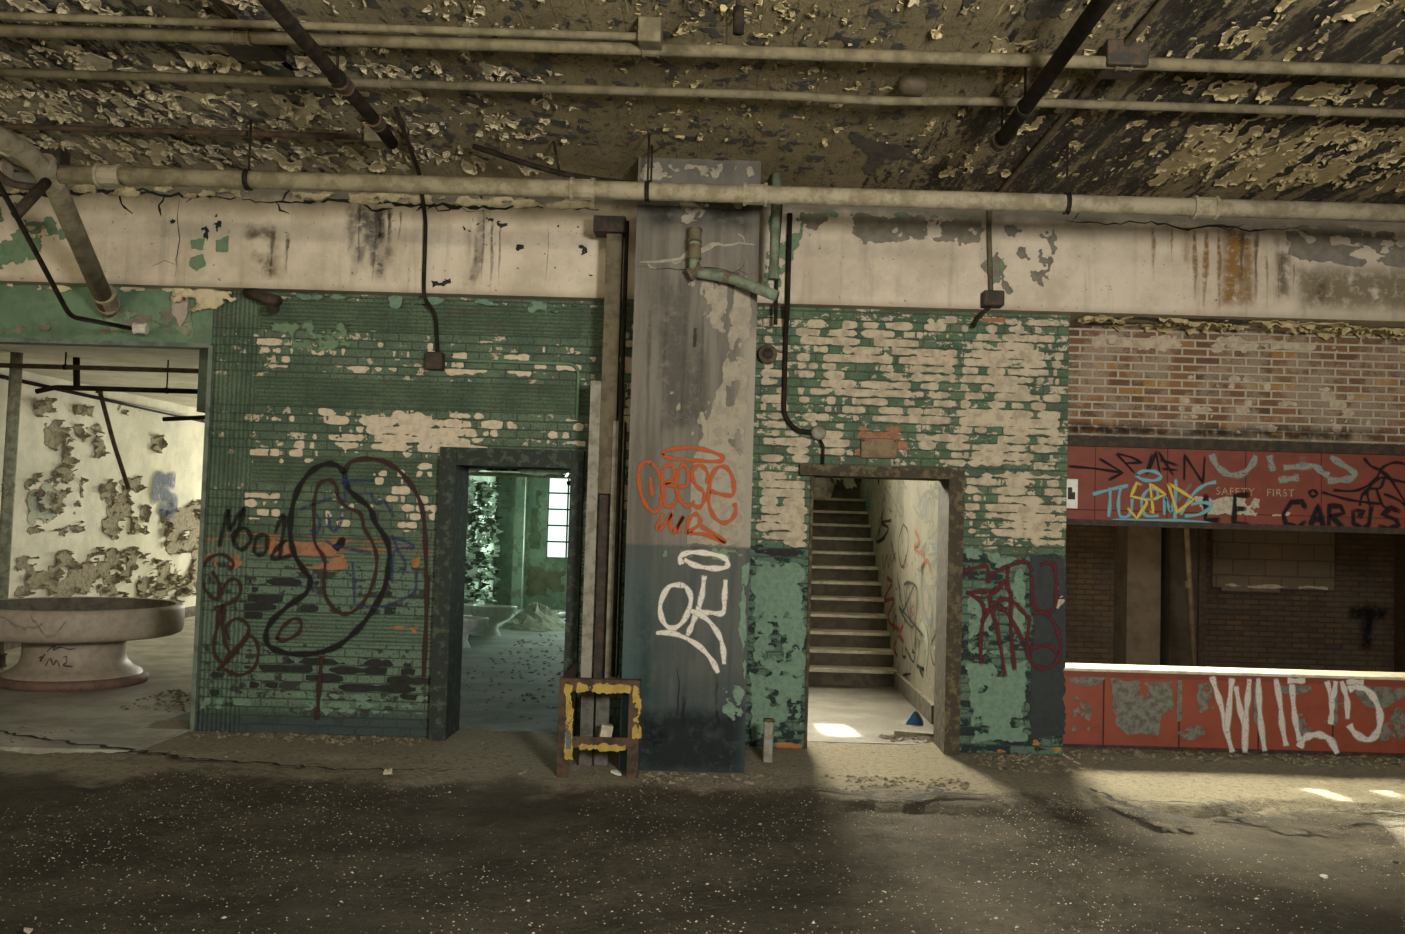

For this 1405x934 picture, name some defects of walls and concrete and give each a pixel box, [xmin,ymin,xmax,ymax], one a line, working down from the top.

peeling [0,188,66,288]
peeling [72,184,248,199]
damp [354,209,402,272]
peeling [388,278,451,309]
peeling [288,191,595,256]
rust [1193,232,1250,301]
peeling [254,319,409,373]
peeling [427,343,487,376]
peeling [504,347,596,377]
peeling [14,397,513,623]
peeling [464,468,570,604]
peeling [663,211,1405,754]